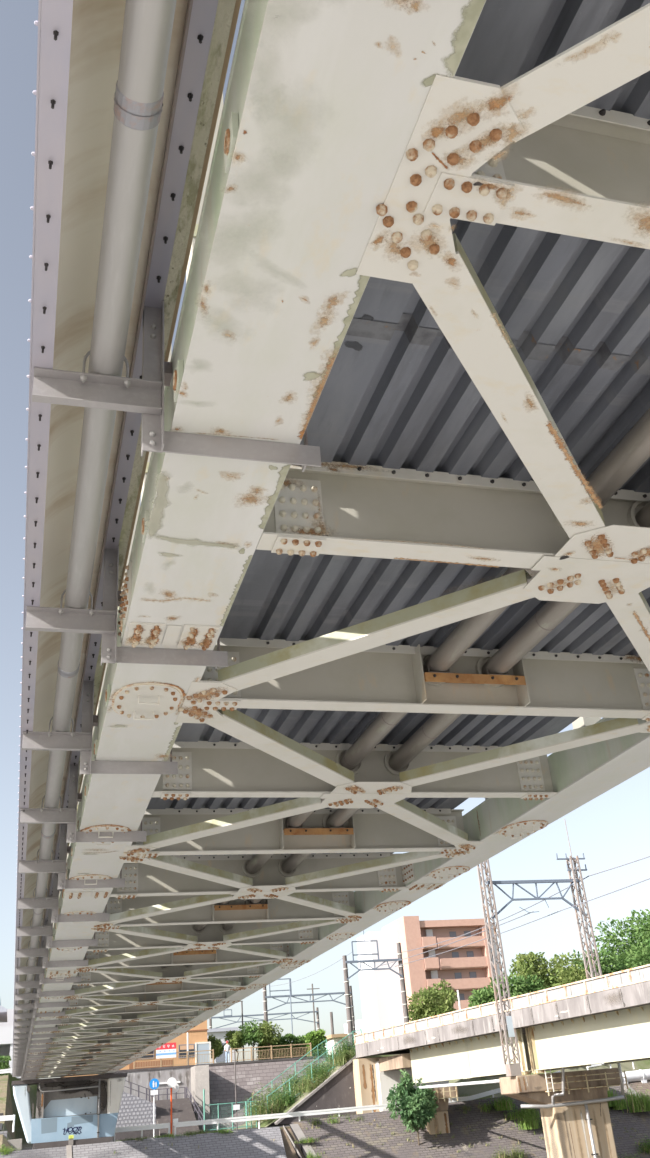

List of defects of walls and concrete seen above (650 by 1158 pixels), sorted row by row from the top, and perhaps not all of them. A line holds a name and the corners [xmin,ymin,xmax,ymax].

rust [431,96,512,138]
rust [547,193,584,206]
rust [546,421,602,508]
rust [129,616,175,644]
rust [145,678,225,718]